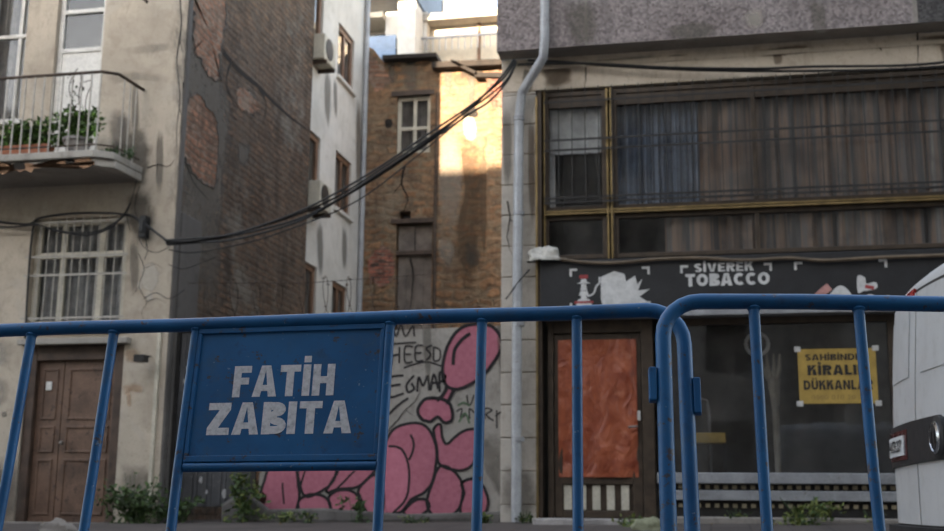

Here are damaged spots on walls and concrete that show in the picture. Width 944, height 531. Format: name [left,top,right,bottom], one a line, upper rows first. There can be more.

flaking render [192,0,227,82]
flaking render [236,86,260,114]
spalling [0,158,94,175]
flaking render [180,82,219,201]
damp [458,150,486,276]